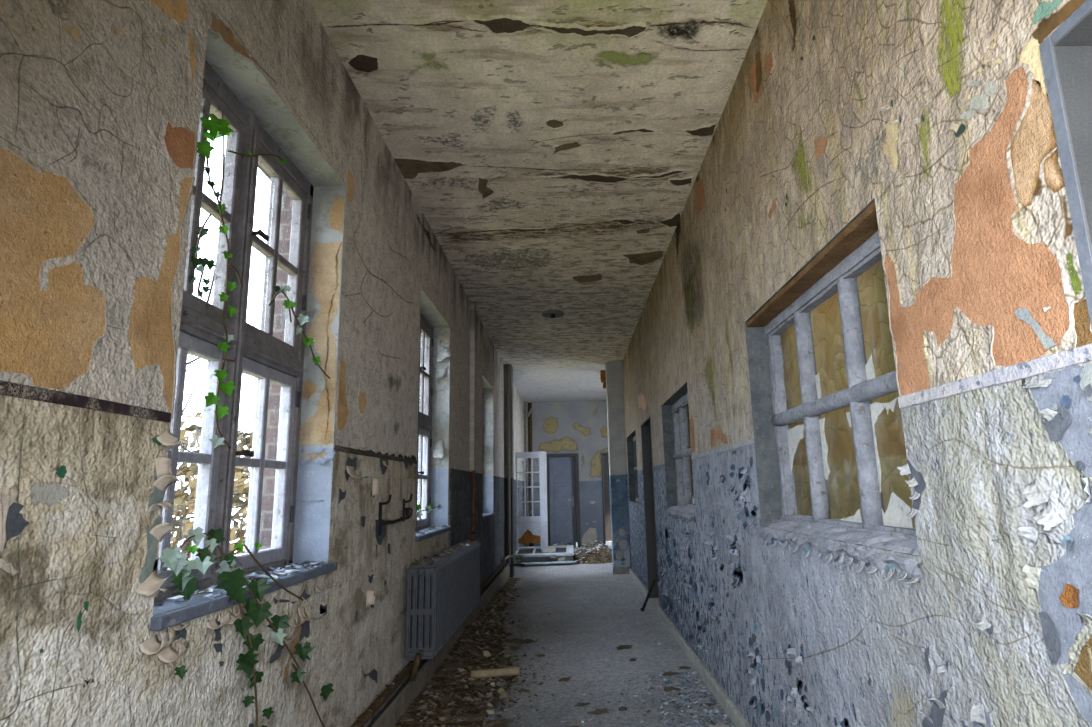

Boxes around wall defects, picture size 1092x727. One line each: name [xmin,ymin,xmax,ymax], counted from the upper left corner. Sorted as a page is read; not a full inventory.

damp [5,551,44,605]
peeling [0,481,70,576]
flaking render [0,143,108,392]
crack [0,429,123,727]
crack [0,0,169,262]
flaking render [124,117,197,597]
flaking render [466,14,651,40]
crack [652,21,753,51]
crack [761,0,981,256]
flaking render [879,34,1092,397]
crack [934,389,1075,469]
peeling [1016,361,1092,727]